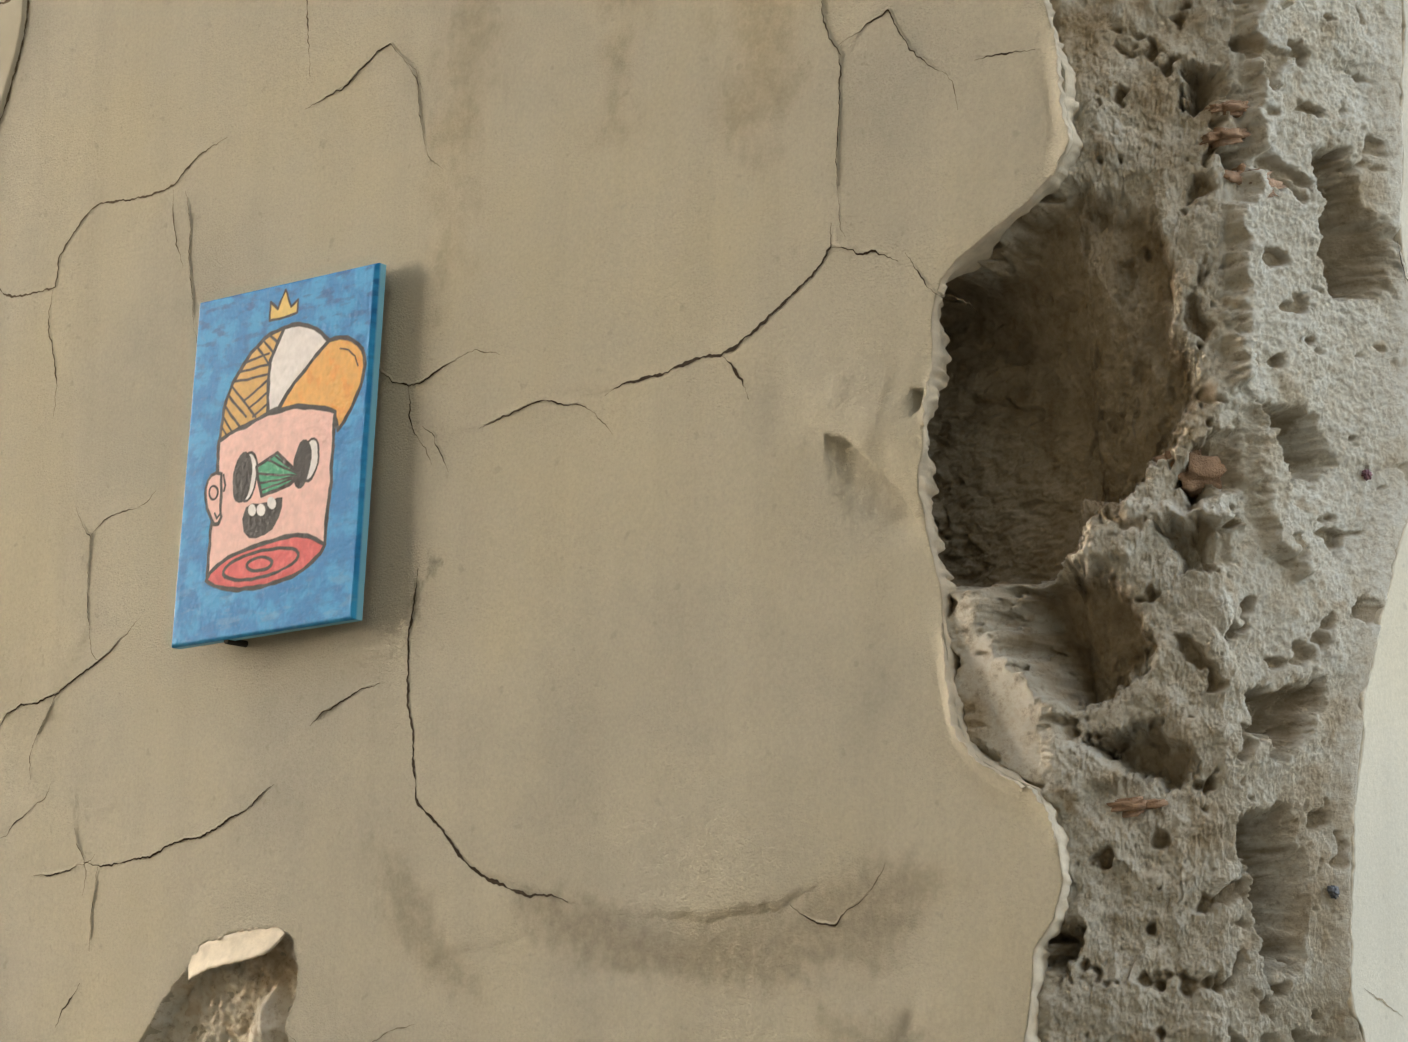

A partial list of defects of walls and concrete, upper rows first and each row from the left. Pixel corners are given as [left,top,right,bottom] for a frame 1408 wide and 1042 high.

crack [0,0,29,120]
crack [305,0,439,166]
crack [0,137,227,417]
crack [479,0,1036,432]
peeling [829,242,900,261]
crack [379,349,498,471]
spalling [916,0,1408,1042]
crack [0,492,155,838]
crack [34,783,274,951]
spalling [144,926,298,1042]